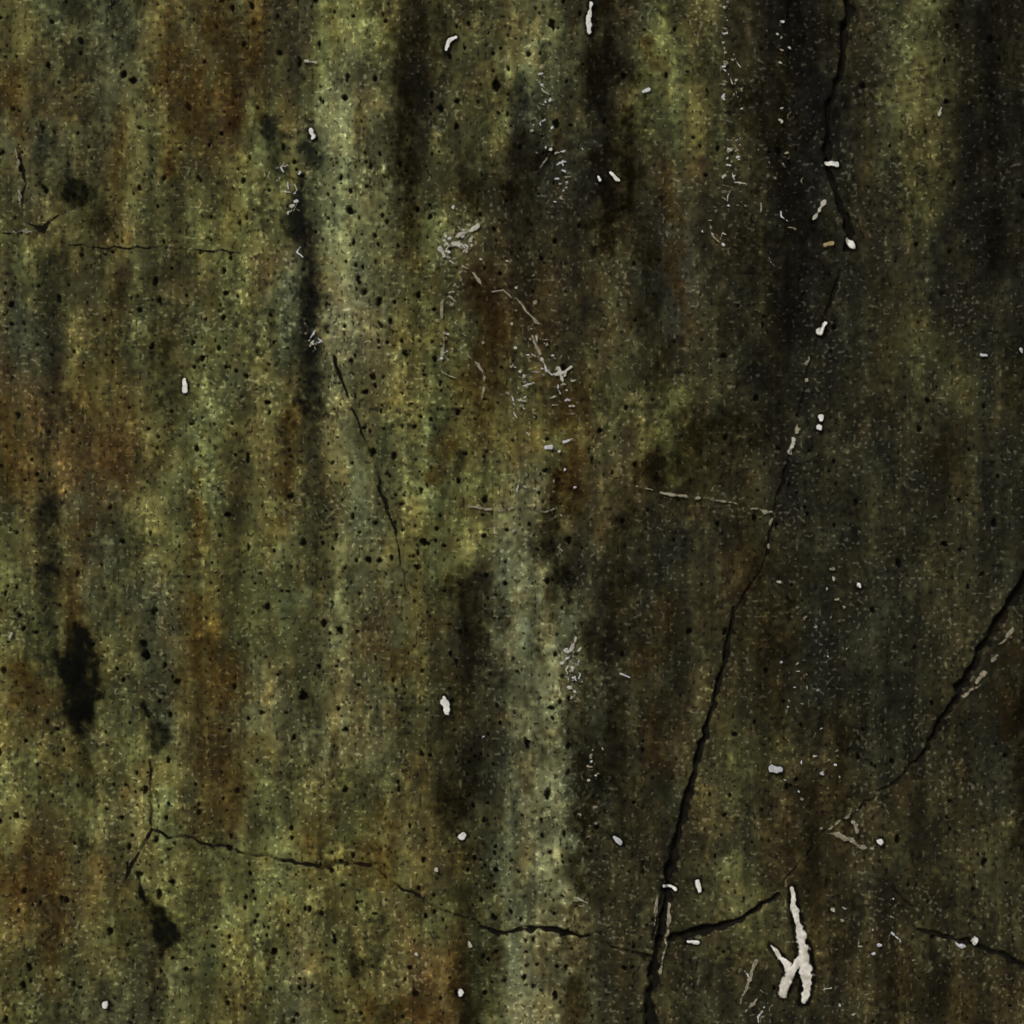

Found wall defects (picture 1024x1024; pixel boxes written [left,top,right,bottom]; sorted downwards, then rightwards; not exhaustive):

crack [18,152,26,196]
crack [3,215,59,235]
crack [69,244,240,253]
crack [821,0,855,252]
crack [333,355,406,592]
leakage [54,626,102,730]
crack [124,455,810,1024]
crack [841,571,1024,818]
leakage [149,905,180,952]
crack [891,887,1024,969]